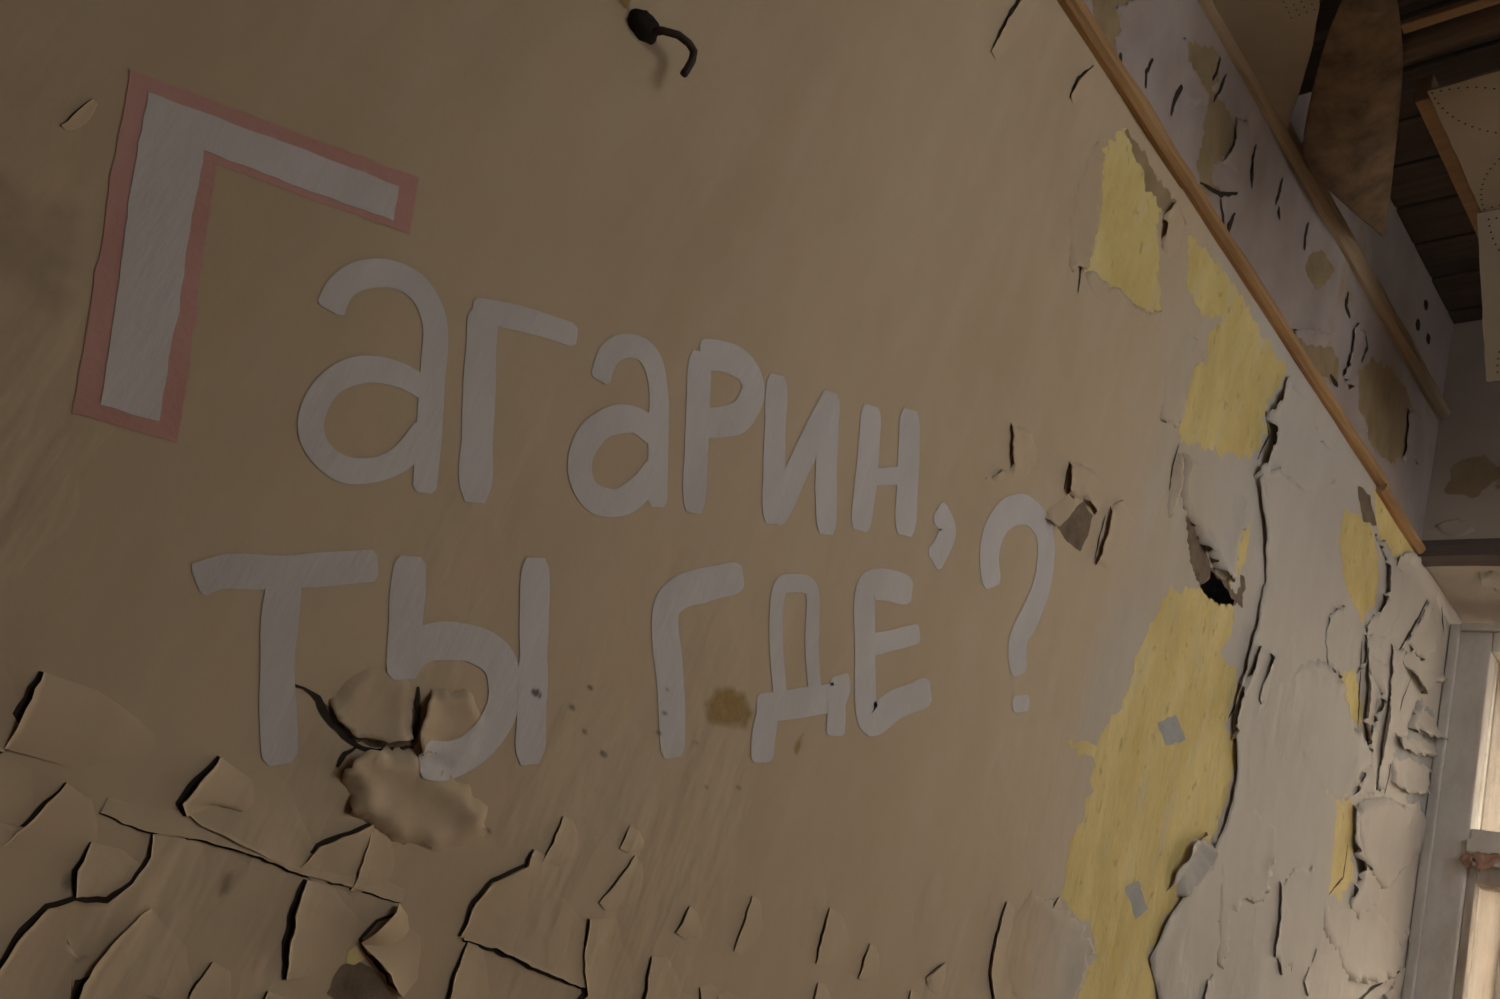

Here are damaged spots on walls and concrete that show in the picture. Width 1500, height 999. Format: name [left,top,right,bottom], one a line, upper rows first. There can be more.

peeling [1092,0,1155,62]
peeling [1172,37,1254,225]
peeling [992,423,1037,483]
peeling [1006,128,1449,999]
peeling [295,668,488,853]
flaking render [327,903,421,999]